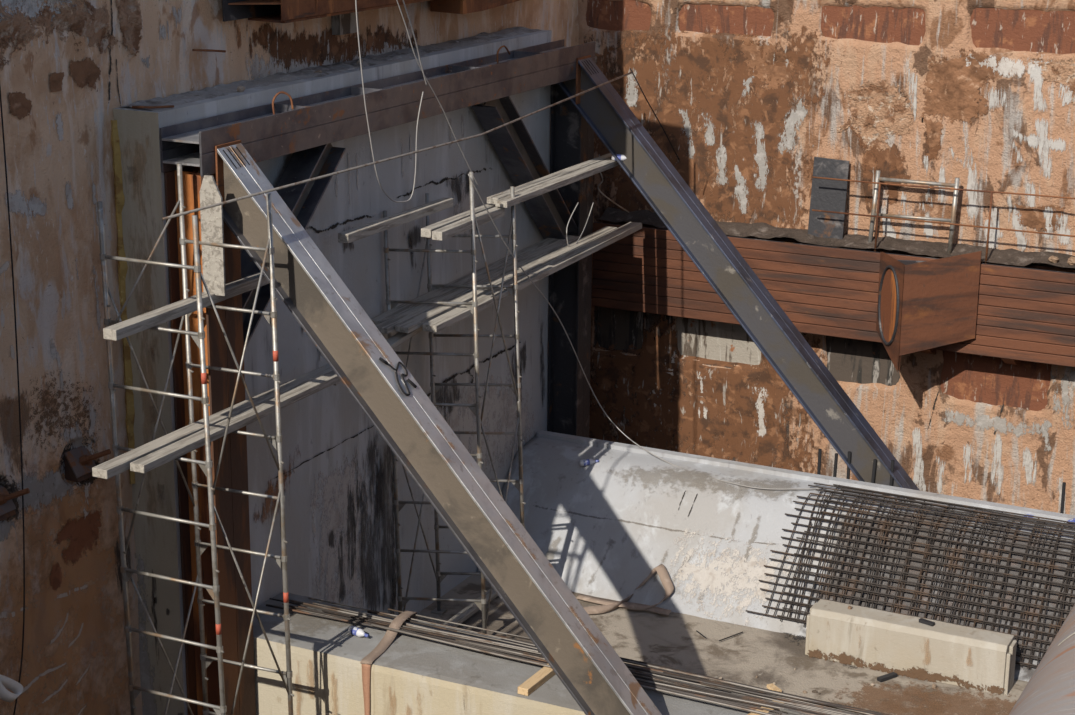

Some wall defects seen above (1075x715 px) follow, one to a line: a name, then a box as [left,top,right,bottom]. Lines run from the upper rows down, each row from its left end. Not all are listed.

spalling [0,0,150,92]
spalling [8,91,32,120]
damp [908,68,917,118]
damp [1059,84,1073,106]
damp [949,54,1070,251]
damp [880,156,945,238]
spalling [50,509,102,591]
damp [311,434,397,614]